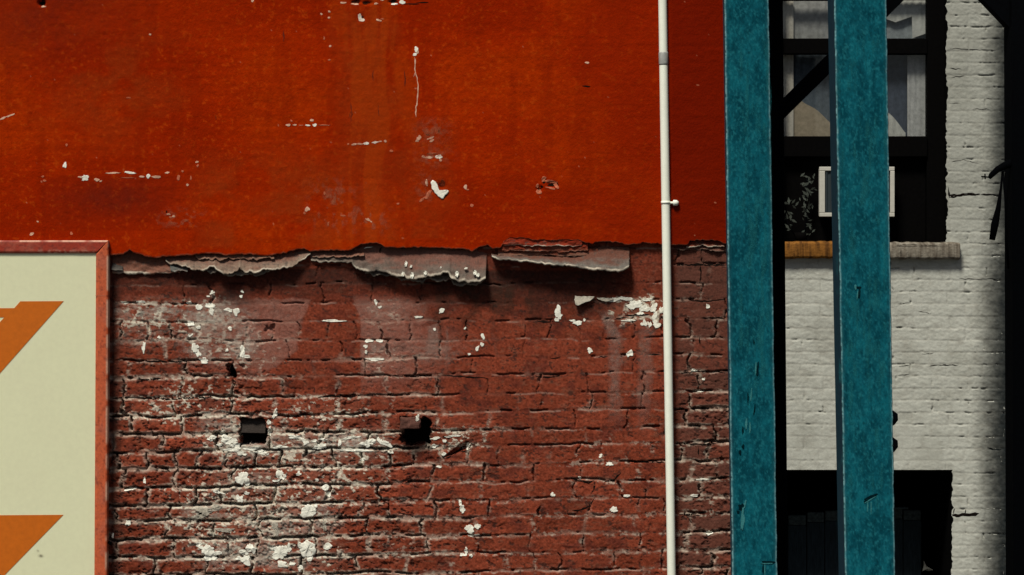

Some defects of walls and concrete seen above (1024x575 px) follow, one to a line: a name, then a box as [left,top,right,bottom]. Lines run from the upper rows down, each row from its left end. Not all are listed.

peeling [78,161,199,186]
spalling [419,179,449,202]
peeling [111,238,630,287]
peeling [186,290,244,364]
peeling [574,296,663,328]
peeling [363,339,384,361]
spalling [207,409,470,468]
peeling [189,472,250,520]
peeling [196,528,234,561]
peeling [235,543,257,566]
peeling [270,504,332,572]
peeling [460,524,481,557]